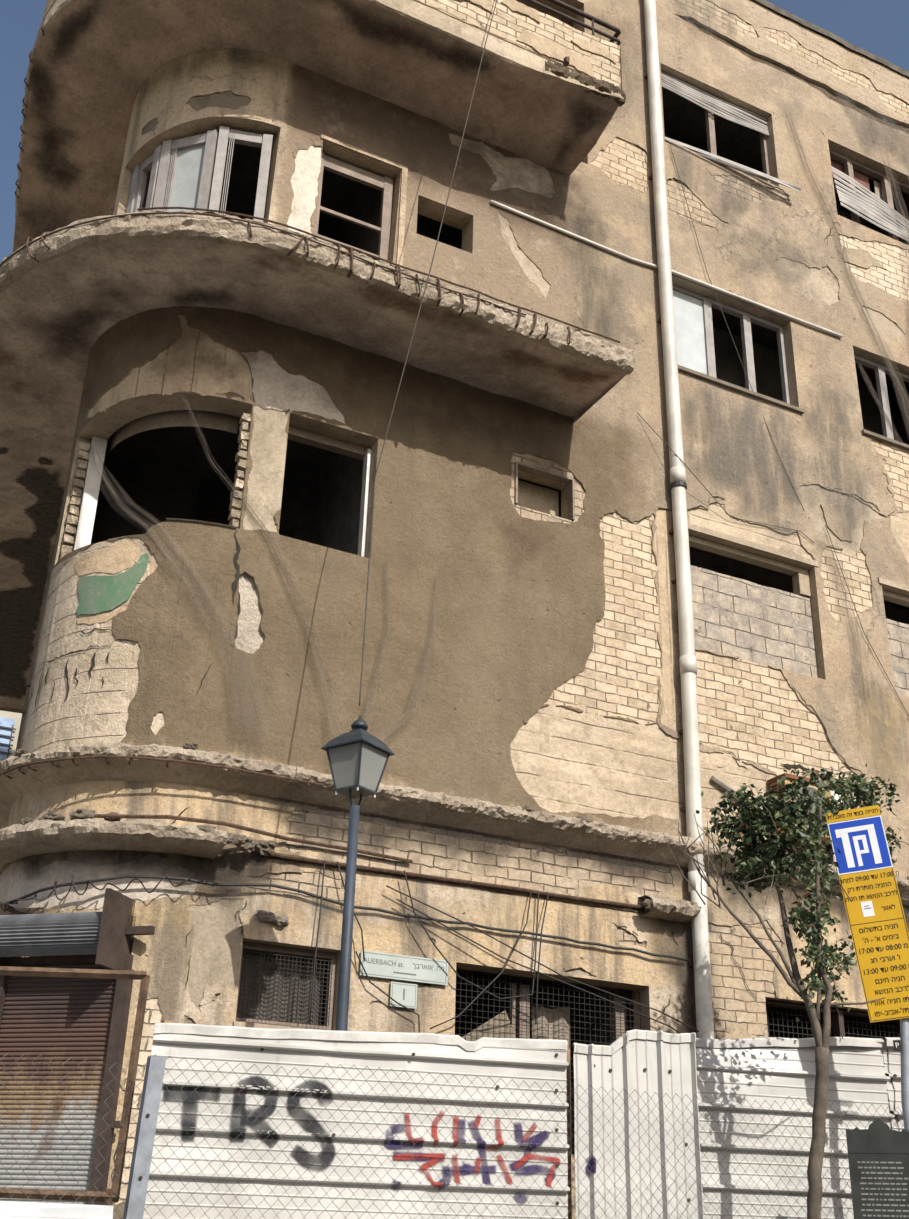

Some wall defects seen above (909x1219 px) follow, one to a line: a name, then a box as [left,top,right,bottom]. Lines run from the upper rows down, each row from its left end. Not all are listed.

leakage [55,8,92,56]
leakage [320,0,488,71]
leakage [29,67,68,180]
flaking render [186,87,251,111]
spalling [0,131,636,375]
flaking render [773,234,909,305]
flaking render [861,304,905,341]
flaking render [87,311,352,532]
flaking render [0,441,334,789]
crack [231,531,241,644]
flaking render [376,439,909,860]
flaking render [0,805,783,1039]